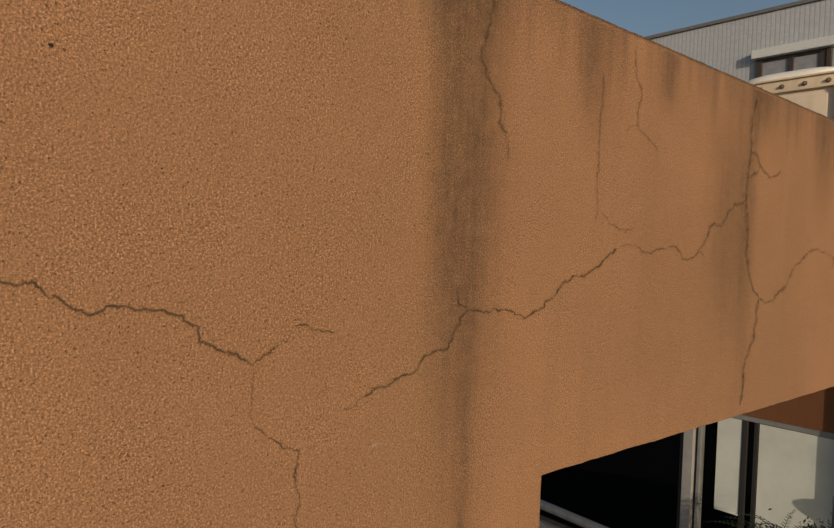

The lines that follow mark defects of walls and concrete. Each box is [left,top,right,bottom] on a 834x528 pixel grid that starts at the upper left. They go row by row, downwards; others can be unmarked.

crack [0,280,275,363]
crack [365,249,616,397]